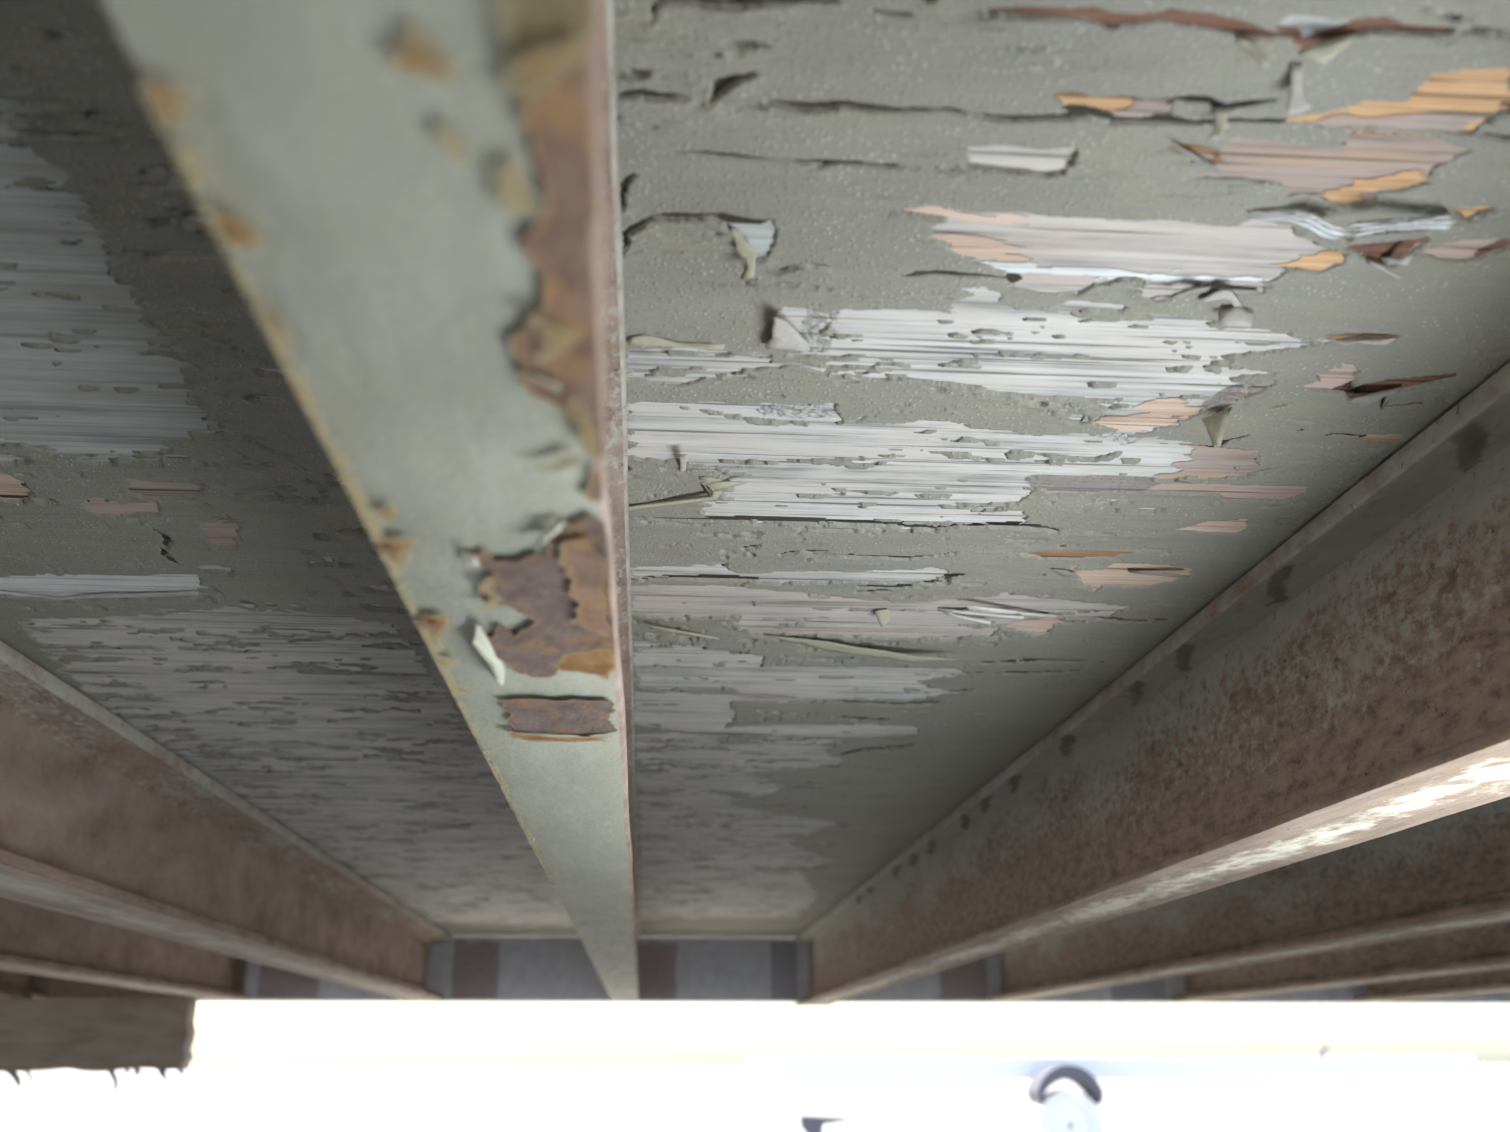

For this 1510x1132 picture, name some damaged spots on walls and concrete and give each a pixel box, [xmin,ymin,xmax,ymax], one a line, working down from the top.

crack [618,69,1288,124]
peeling [1169,15,1510,203]
crack [671,150,956,170]
crack [620,173,770,248]
peeling [0,99,218,458]
crack [901,270,1023,283]
corrosion [460,0,617,742]
peeling [626,205,1500,529]
peeling [630,546,1193,919]
corrosion [232,958,318,998]
corrosion [452,939,499,999]
corrosion [940,957,987,999]